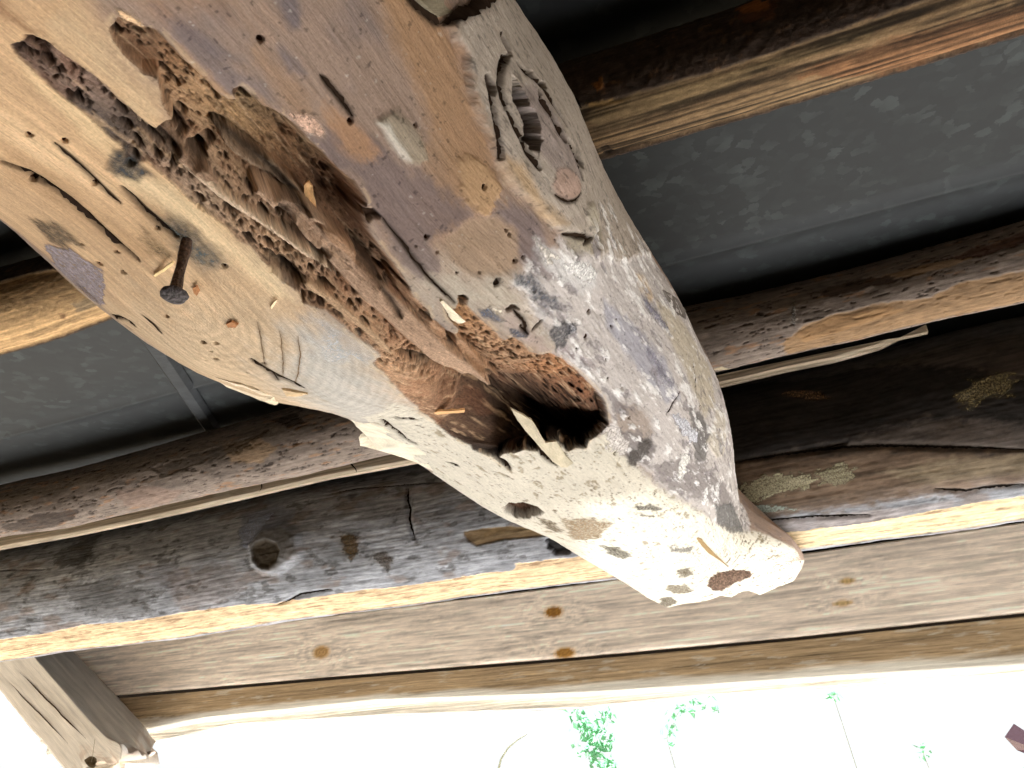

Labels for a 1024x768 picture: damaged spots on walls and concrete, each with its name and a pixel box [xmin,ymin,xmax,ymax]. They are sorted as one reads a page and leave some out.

crack [320,75,353,116]
crack [488,32,582,202]
crack [20,166,139,258]
crack [55,142,174,232]
spalling [9,11,629,466]
crack [251,322,302,386]